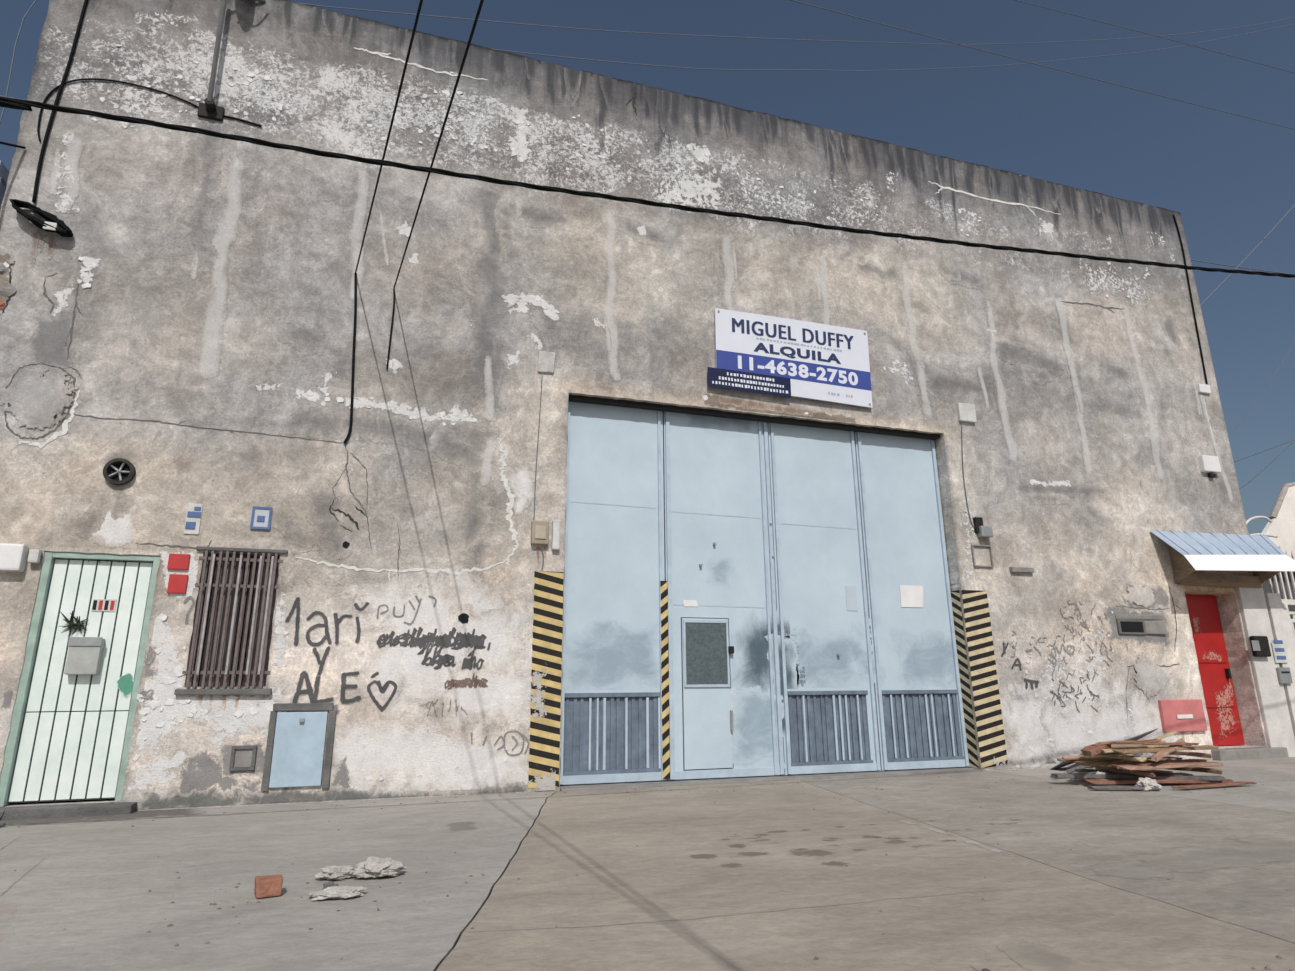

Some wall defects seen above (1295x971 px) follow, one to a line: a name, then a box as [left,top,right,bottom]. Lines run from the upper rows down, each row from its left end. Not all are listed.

leakage [283,1,359,50]
leakage [490,50,778,164]
spalling [0,253,15,319]
crack [1,262,15,313]
crack [0,273,519,586]
leakage [816,247,1182,571]